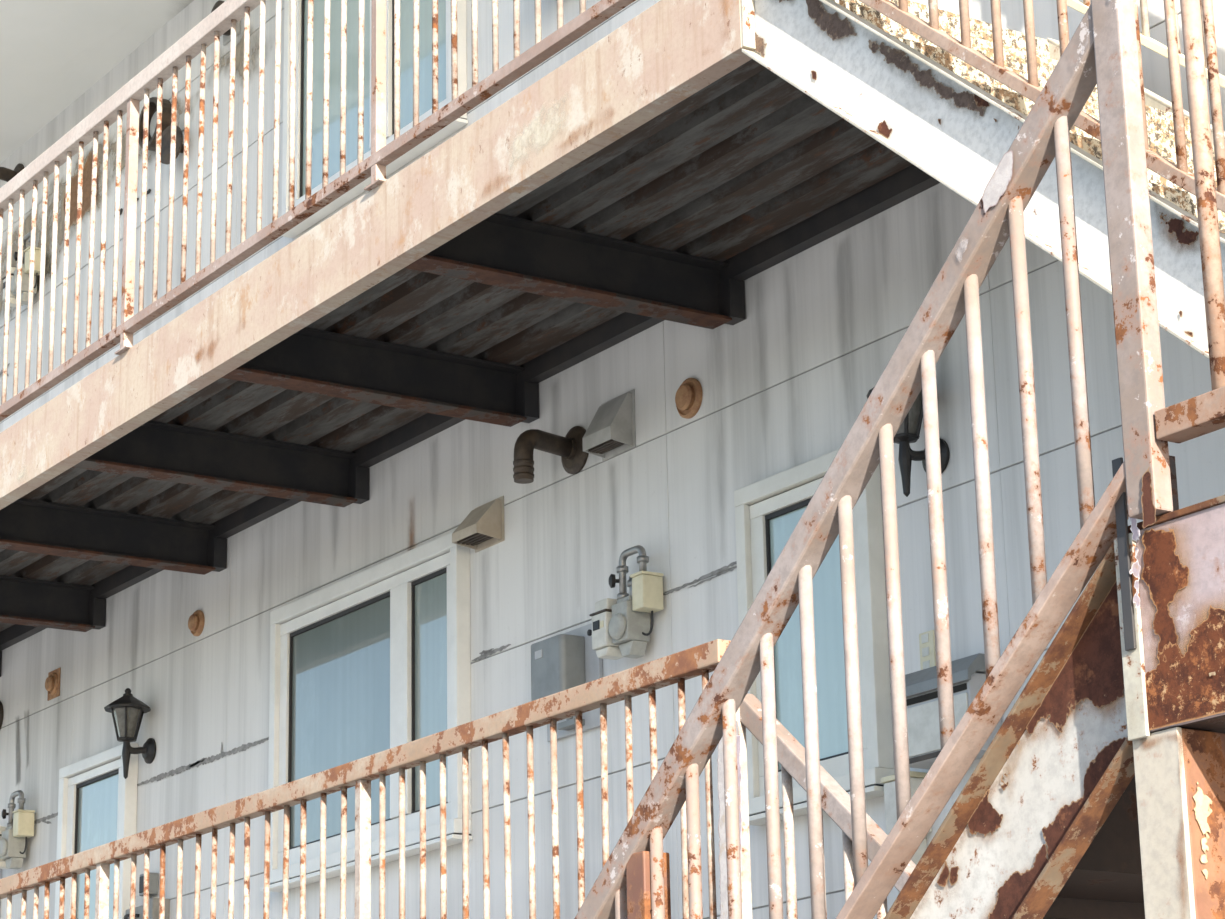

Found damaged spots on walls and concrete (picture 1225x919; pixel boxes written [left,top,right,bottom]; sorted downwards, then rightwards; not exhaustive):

corrosion [1017,580,1124,745]
corrosion [1141,467,1225,756]
corrosion [937,861,959,887]
corrosion [967,756,1010,837]
corrosion [988,737,1126,919]